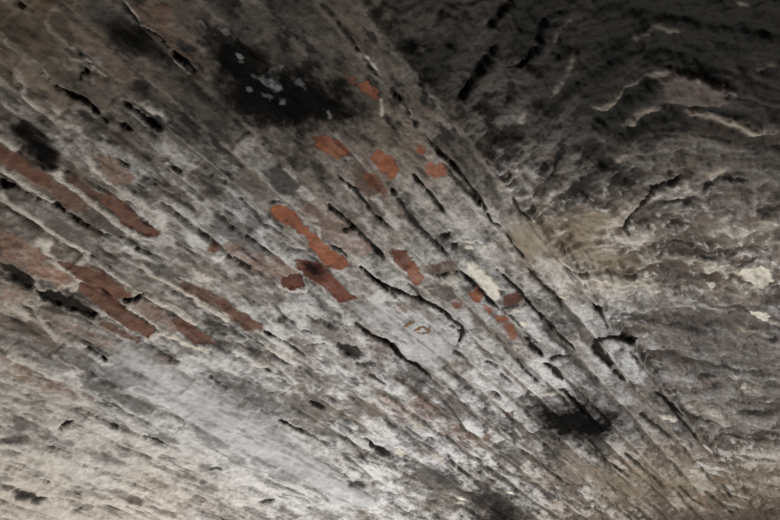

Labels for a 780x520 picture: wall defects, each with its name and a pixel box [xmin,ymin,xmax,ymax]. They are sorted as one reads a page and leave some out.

flaking render [0,146,54,189]
flaking render [365,150,399,196]
flaking render [98,192,161,237]
flaking render [57,261,155,344]
flaking render [172,318,216,345]
flaking render [214,298,261,331]
flaking render [271,204,358,302]
crack [328,242,465,340]
flaking render [390,249,424,286]
peeling [465,261,527,339]
peeling [736,265,775,289]
peeling [749,310,771,321]